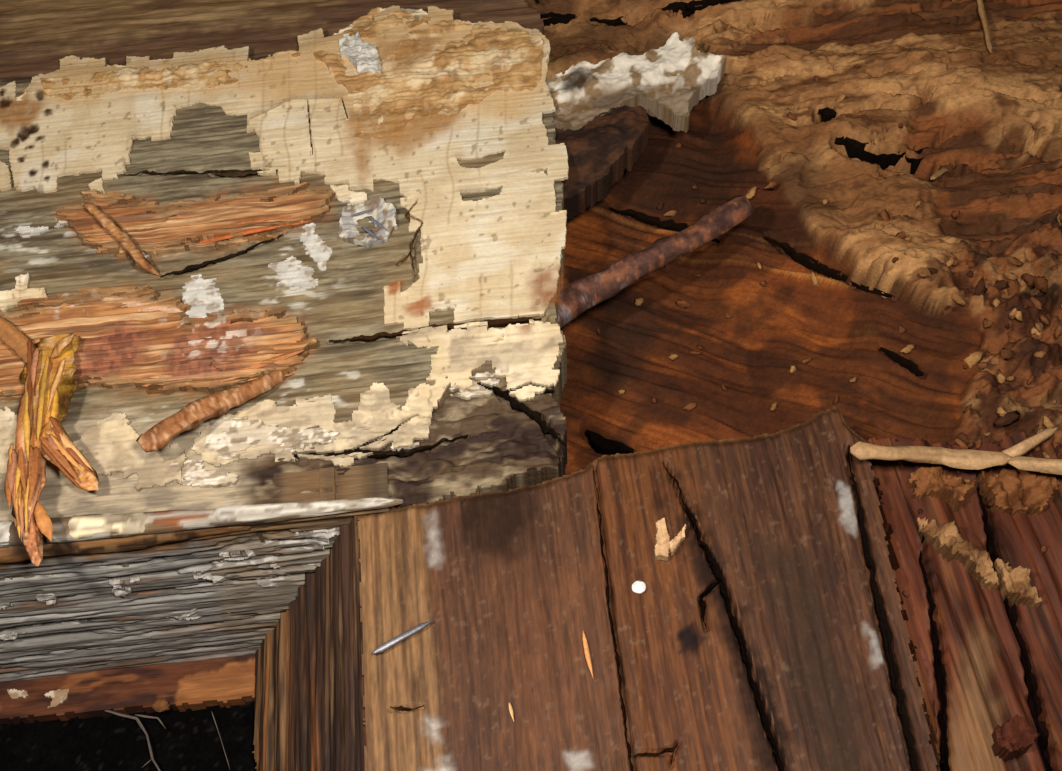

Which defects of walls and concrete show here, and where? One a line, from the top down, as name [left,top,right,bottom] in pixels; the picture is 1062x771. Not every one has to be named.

crack [535,0,627,26]
crack [662,0,741,18]
crack [818,107,948,175]
crack [609,207,688,232]
peeling [0,5,569,492]
crack [764,236,895,298]
crack [880,347,924,376]
peeling [213,497,394,523]
peeling [0,520,13,548]
peeling [68,513,148,539]
crack [470,378,679,771]
crack [663,462,784,771]